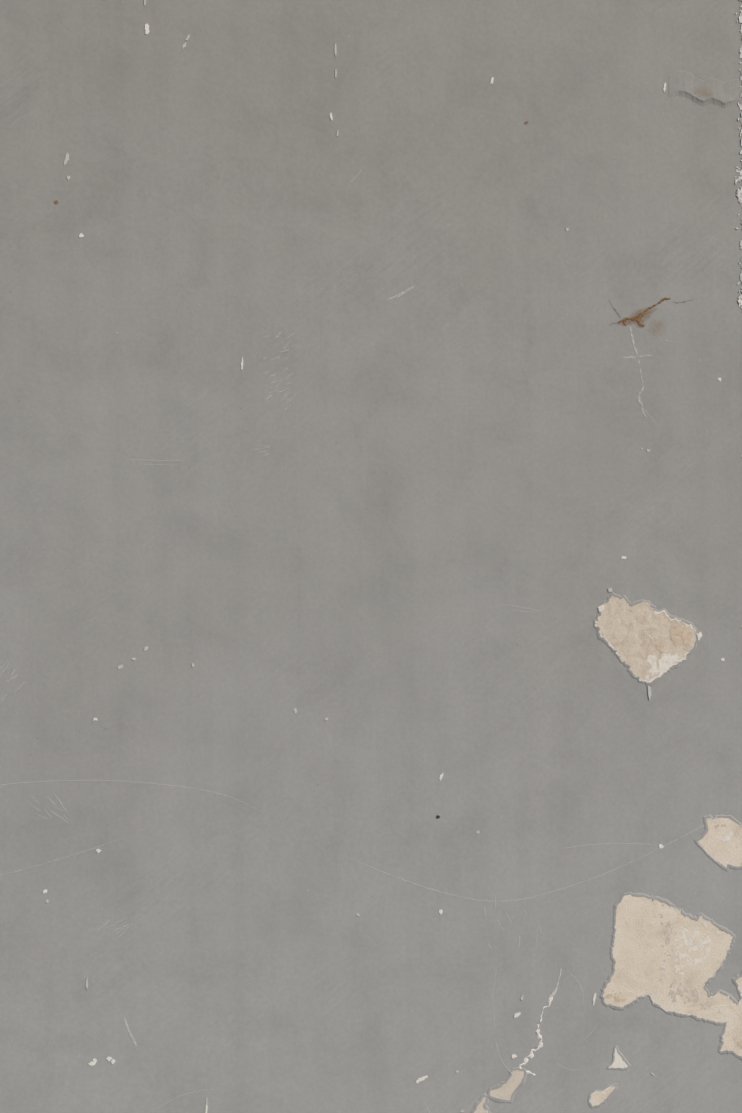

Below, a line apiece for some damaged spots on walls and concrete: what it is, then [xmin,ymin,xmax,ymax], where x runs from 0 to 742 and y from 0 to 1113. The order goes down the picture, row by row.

peeling [593,588,702,700]
peeling [694,814,742,872]
crack [512,968,561,1076]
peeling [593,891,742,1061]
peeling [460,1067,527,1113]
peeling [587,1045,631,1109]